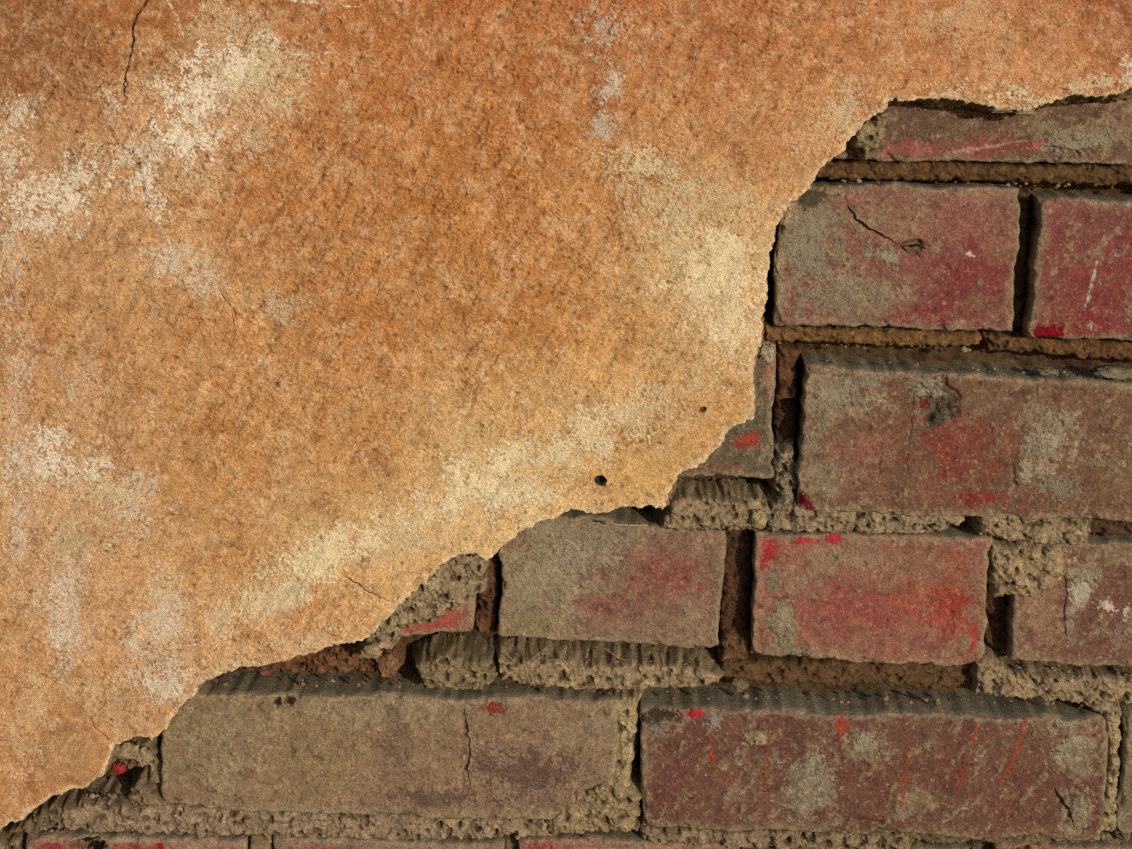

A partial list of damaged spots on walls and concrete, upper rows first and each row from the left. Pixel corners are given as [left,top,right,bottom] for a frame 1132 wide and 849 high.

crack [123,0,148,95]
spalling [846,88,1132,142]
peeling [944,125,1132,163]
peeling [629,166,907,446]
peeling [0,0,332,790]
spalling [904,375,956,431]
peeling [1017,407,1084,502]
spalling [359,565,441,659]
spalling [640,708,728,738]
peeling [776,728,888,823]
spalling [1044,717,1107,836]
spalling [82,836,105,849]